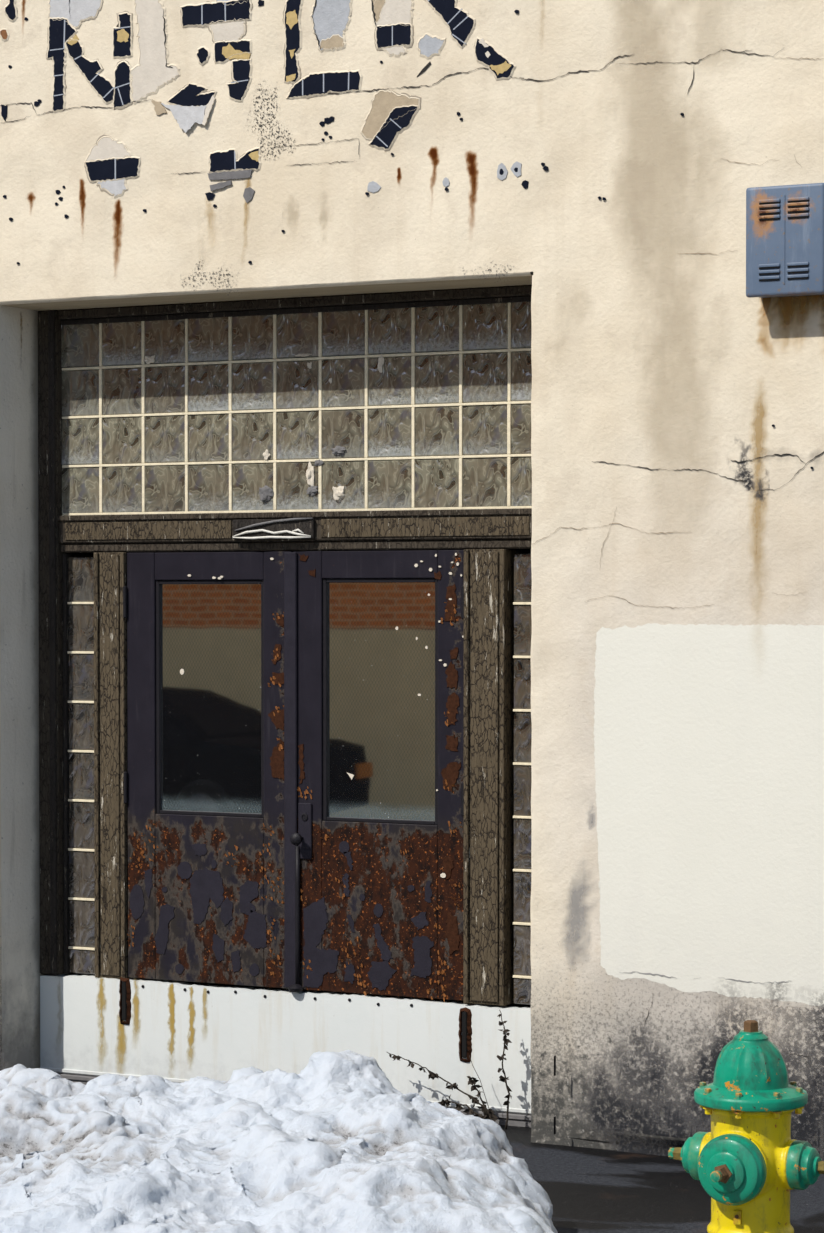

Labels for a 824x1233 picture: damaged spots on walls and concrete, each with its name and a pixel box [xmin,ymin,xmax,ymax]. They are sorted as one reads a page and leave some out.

peeling [208,0,263,43]
peeling [370,0,414,28]
peeling [130,0,181,115]
crack [312,49,824,95]
crack [0,100,147,123]
rust [114,200,122,260]
rust [762,295,824,342]
crack [592,452,824,491]
damp [735,403,765,559]
rust [119,977,131,1025]
damp [587,1010,743,1156]
damp [782,1004,824,1161]